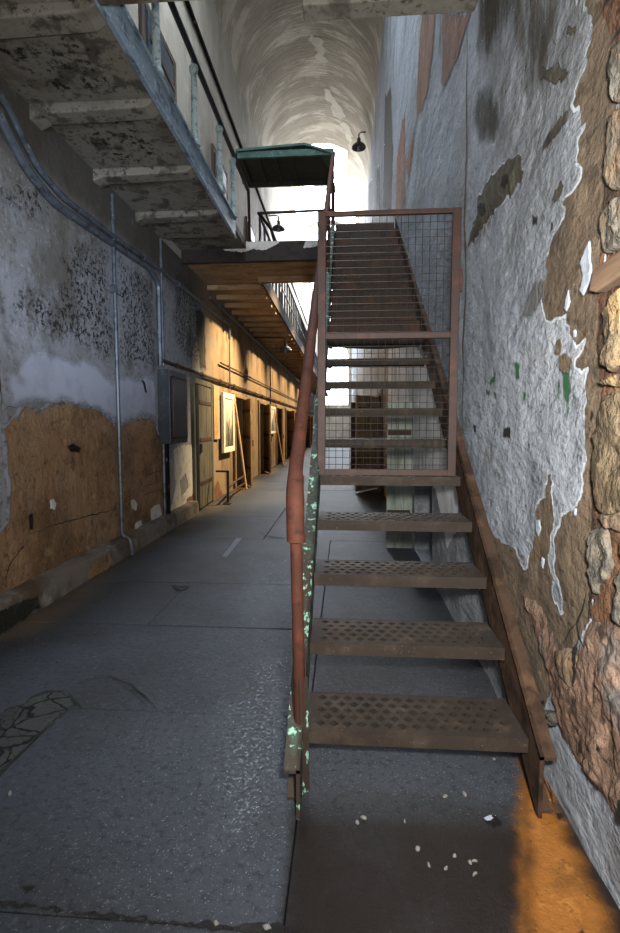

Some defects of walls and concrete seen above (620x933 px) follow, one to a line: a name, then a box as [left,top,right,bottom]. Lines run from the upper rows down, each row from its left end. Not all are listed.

flaking render [416,12,470,114]
flaking render [395,115,414,219]
water stain [18,244,155,366]
peeling [490,0,620,824]
spalling [0,400,194,593]